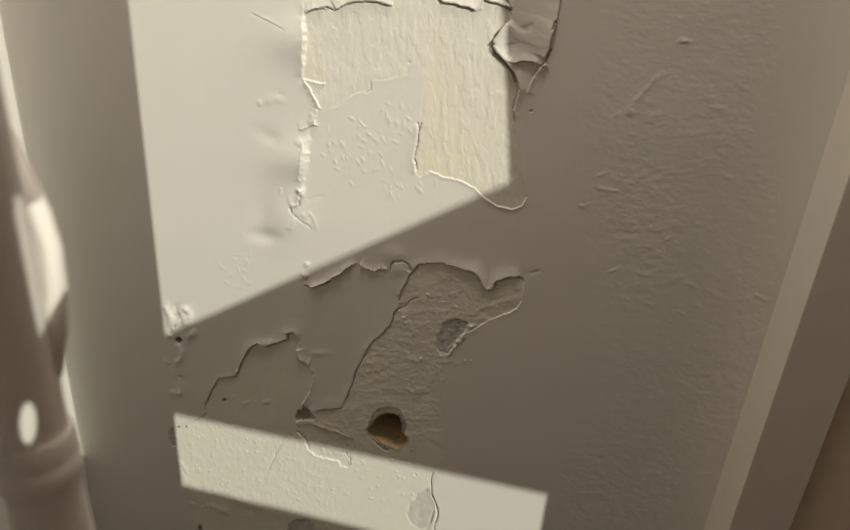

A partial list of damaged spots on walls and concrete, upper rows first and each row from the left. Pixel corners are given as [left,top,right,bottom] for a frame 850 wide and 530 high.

peeling [279,0,531,235]
peeling [168,246,534,530]